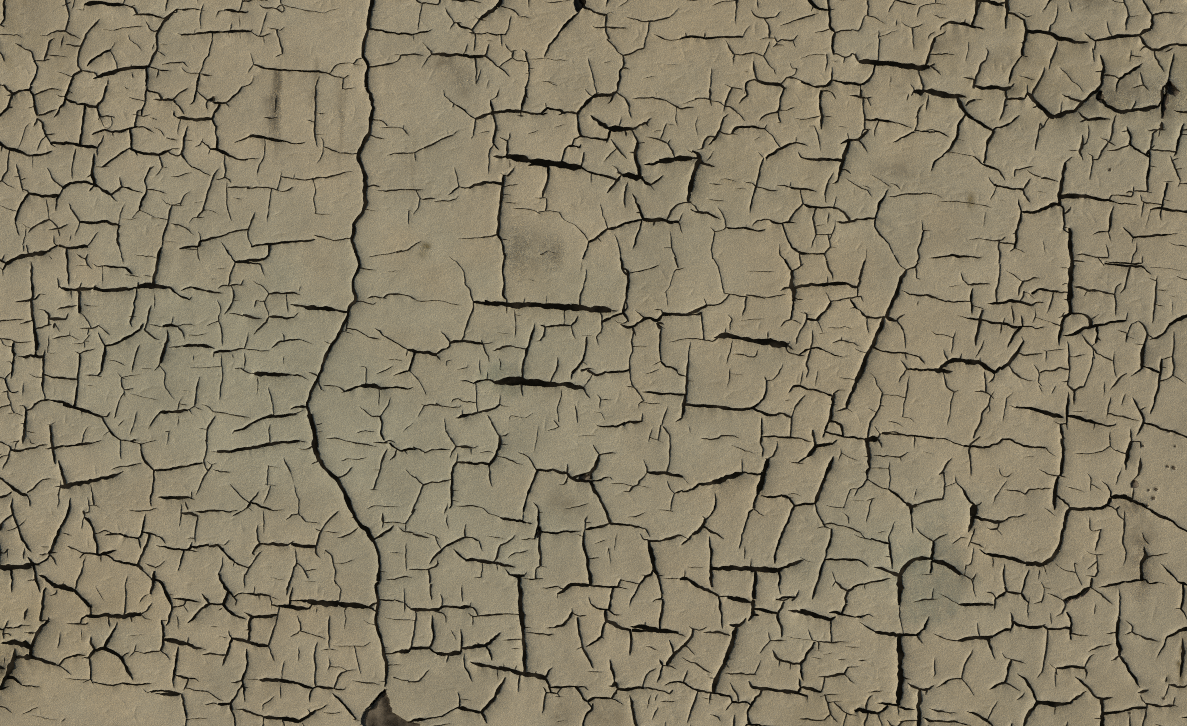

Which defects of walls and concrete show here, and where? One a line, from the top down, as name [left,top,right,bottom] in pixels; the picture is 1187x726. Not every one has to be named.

crack [445,0,528,51]
crack [234,134,305,172]
crack [931,252,980,260]
crack [114,346,156,418]
crack [148,379,201,429]
crack [597,396,643,428]
crack [326,399,477,490]
crack [252,616,356,720]
crack [989,653,1025,700]
crack [143,689,205,726]
spalling [359,689,420,726]
crack [629,695,638,726]